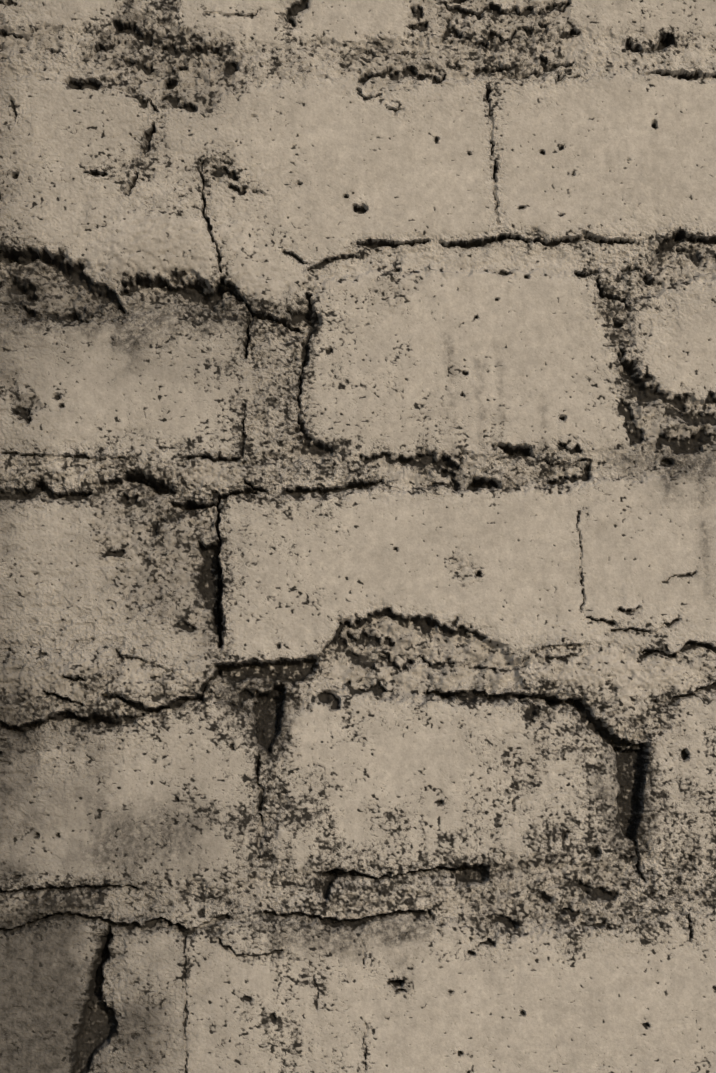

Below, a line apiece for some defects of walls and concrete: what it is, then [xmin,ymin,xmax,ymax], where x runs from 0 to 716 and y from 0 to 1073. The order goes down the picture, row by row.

spalling [330,0,584,116]
crack [83,122,156,195]
crack [281,85,636,271]
crack [199,159,301,359]
crack [574,270,628,309]
crack [0,403,383,756]
spalling [89,469,581,764]
crack [521,510,716,664]
crack [424,688,649,753]
crack [653,682,716,707]
crack [0,884,285,1073]
crack [263,866,456,969]